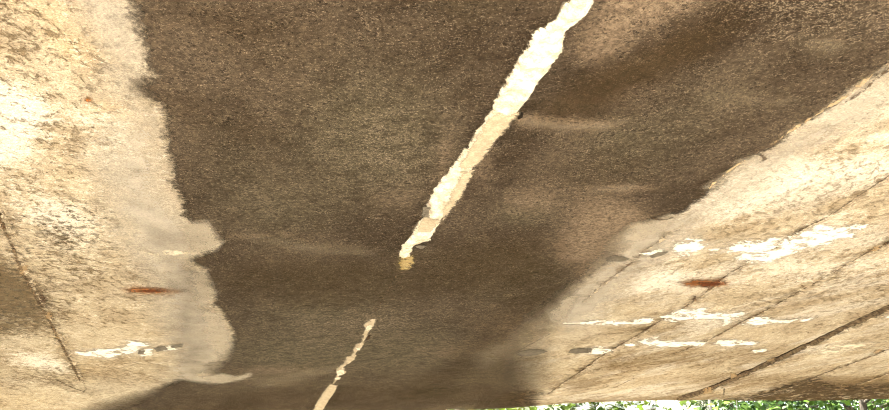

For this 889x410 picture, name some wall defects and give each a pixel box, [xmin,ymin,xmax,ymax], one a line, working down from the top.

damp [559,32,713,113]
damp [47,210,84,242]
corrosion [126,287,179,295]
corrosion [681,280,728,289]